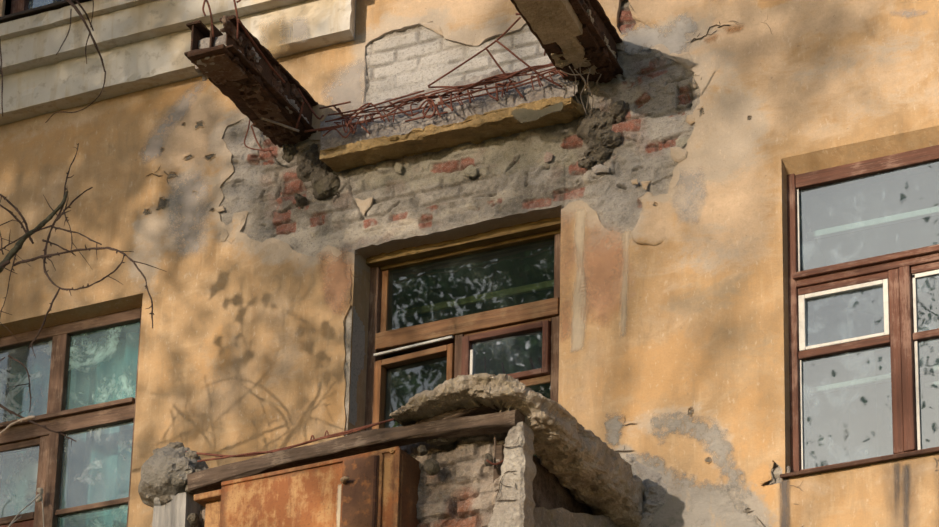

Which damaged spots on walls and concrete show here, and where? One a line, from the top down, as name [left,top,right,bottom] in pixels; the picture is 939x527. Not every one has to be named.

spalling [202,0,214,38]
crack [685,21,738,43]
flaking render [208,0,704,257]
flaking render [143,196,170,215]
peeling [605,416,623,445]
peeling [624,407,760,527]
flaking render [758,461,790,486]
damp [894,465,909,527]